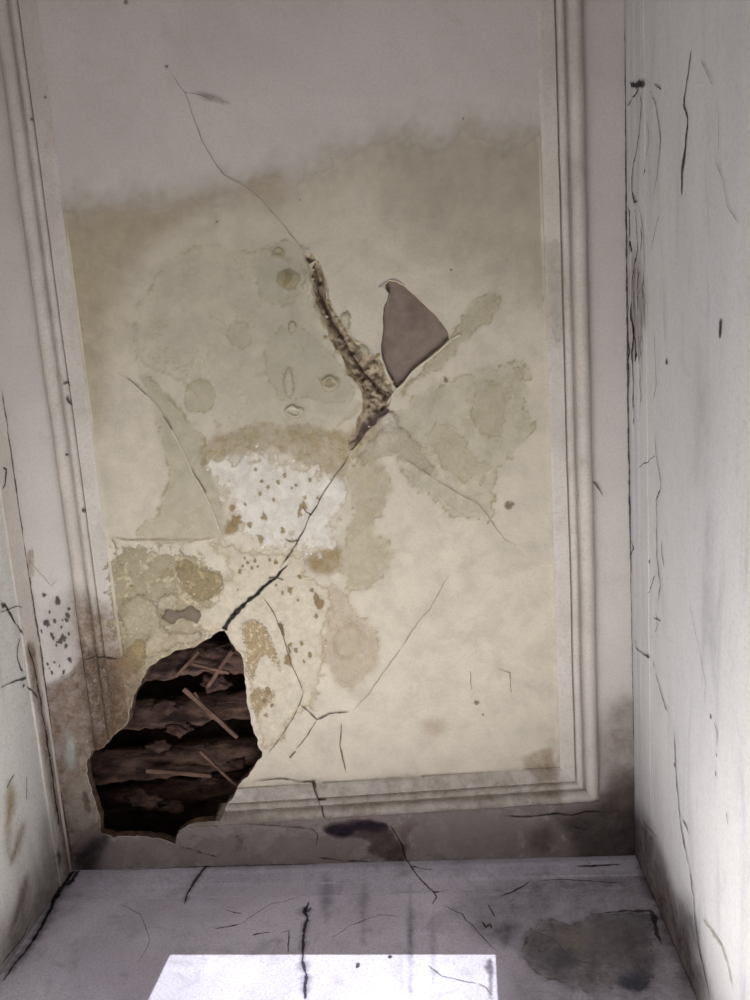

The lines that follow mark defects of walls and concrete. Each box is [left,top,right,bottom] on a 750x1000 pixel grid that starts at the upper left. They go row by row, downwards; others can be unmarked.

peeling [87,443,347,843]
crack [2,81,444,979]
water stain [28,135,702,996]
flaking render [379,279,460,403]
crack [624,52,712,735]
crack [212,898,311,998]
crack [429,966,491,994]
crack [673,741,707,983]